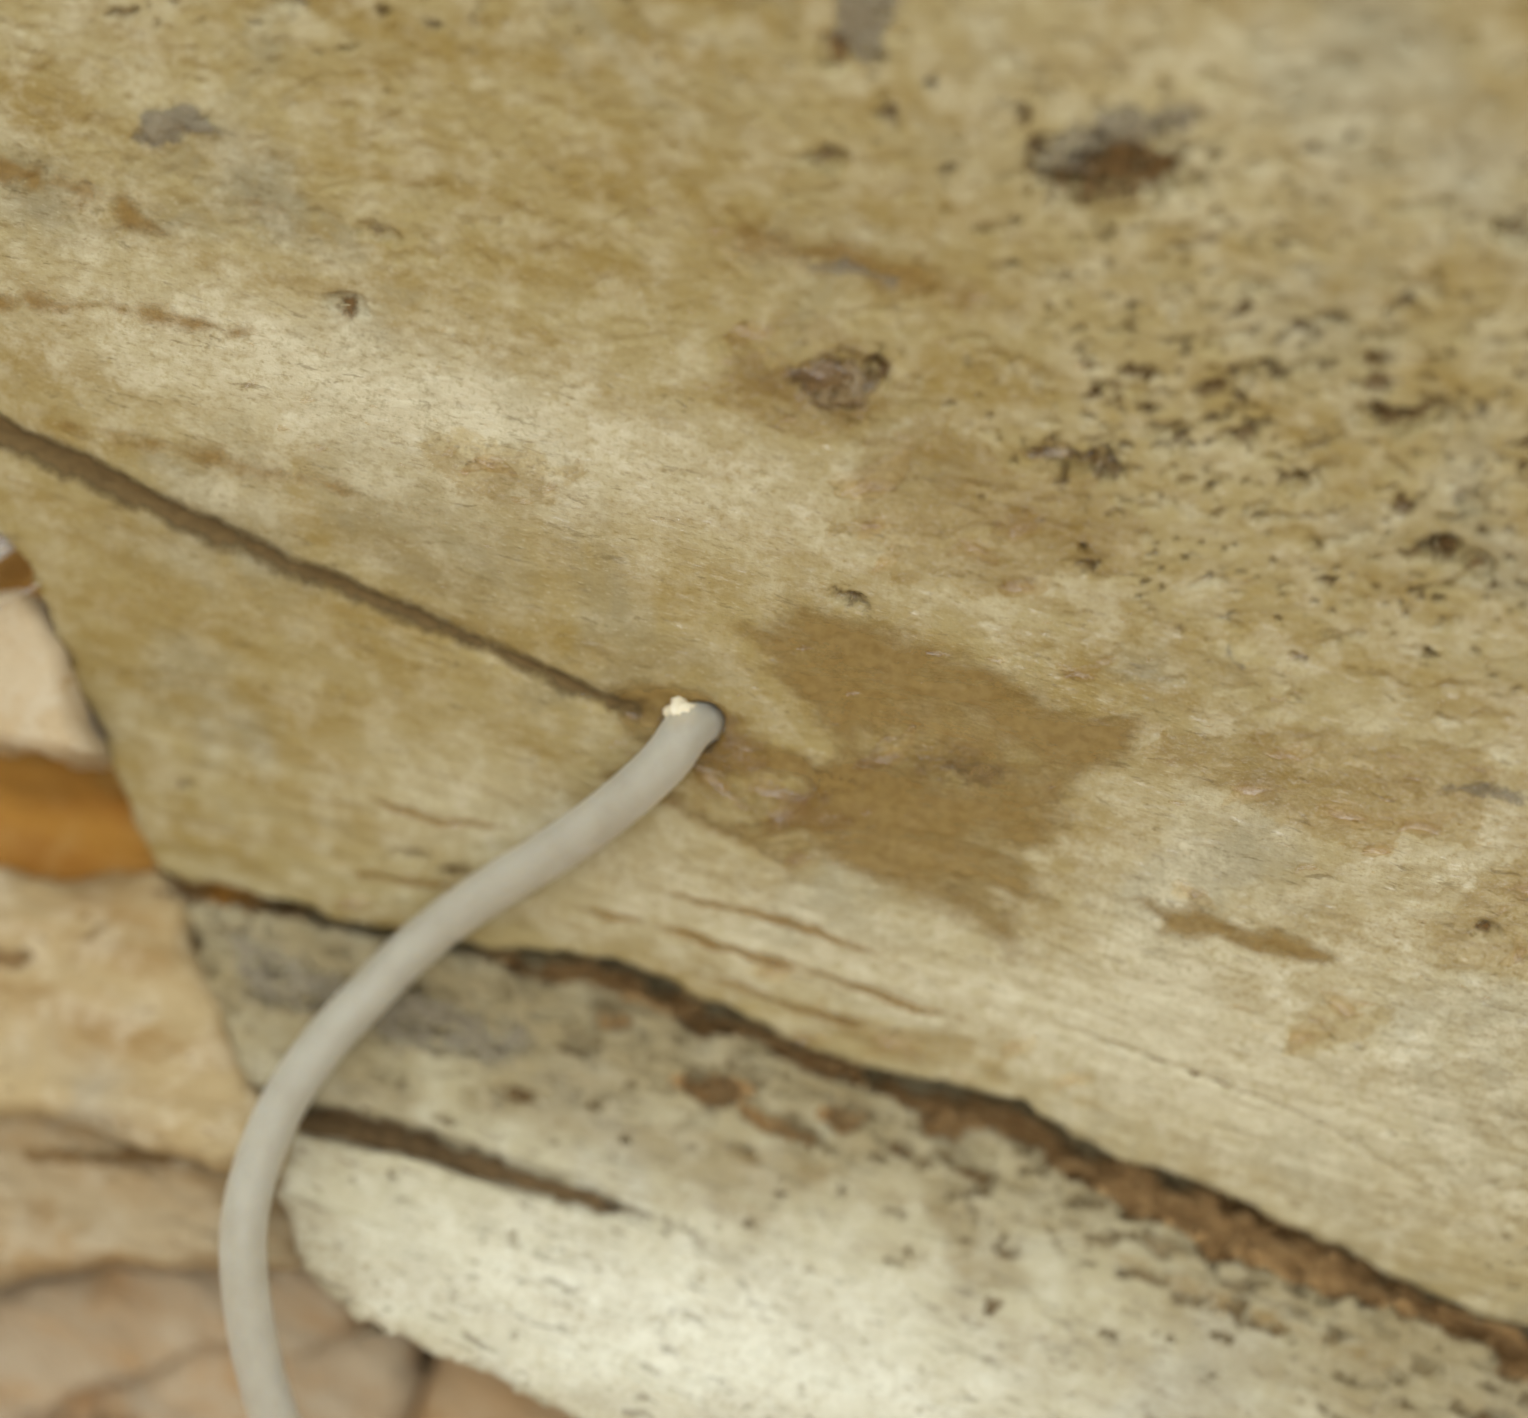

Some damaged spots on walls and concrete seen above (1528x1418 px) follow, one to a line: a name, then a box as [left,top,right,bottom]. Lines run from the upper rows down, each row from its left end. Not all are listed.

crack [0,414,640,716]
damp [616,610,1134,910]